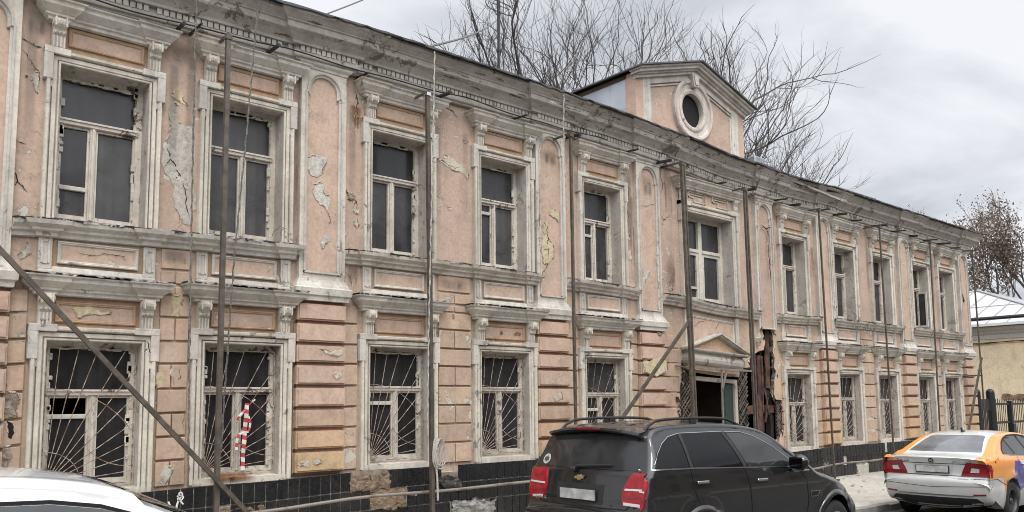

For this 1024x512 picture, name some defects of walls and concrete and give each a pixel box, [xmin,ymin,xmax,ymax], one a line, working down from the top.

peeling [161,86,196,225]
peeling [308,154,330,210]
peeling [438,154,469,179]
peeling [542,208,560,265]
peeling [72,306,112,318]
spalling [643,349,687,417]
spalling [0,384,21,467]
spalling [349,473,408,510]